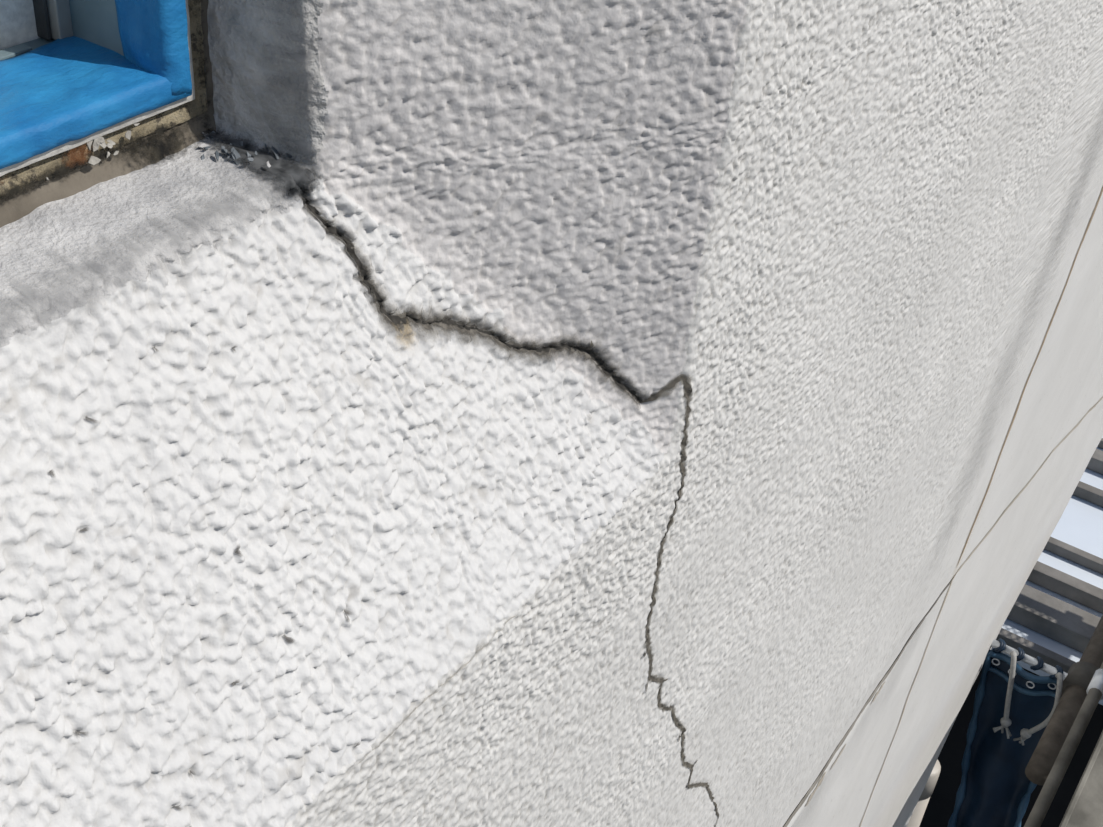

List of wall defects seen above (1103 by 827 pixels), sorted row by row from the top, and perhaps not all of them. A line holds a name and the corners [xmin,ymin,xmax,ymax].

crack [301,188,719,827]